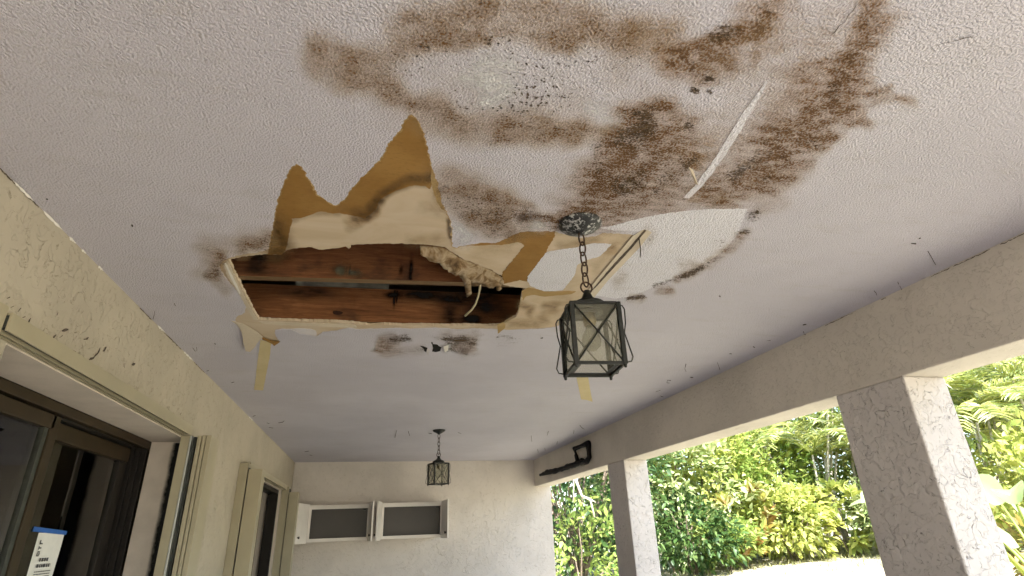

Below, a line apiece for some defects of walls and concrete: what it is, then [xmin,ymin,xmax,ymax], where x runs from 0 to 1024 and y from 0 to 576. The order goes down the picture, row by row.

leakage [310,0,907,301]
mould [203,249,226,281]
leakage [237,234,285,274]
mould [374,334,423,354]
peeling [268,114,611,300]
leakage [386,260,502,355]